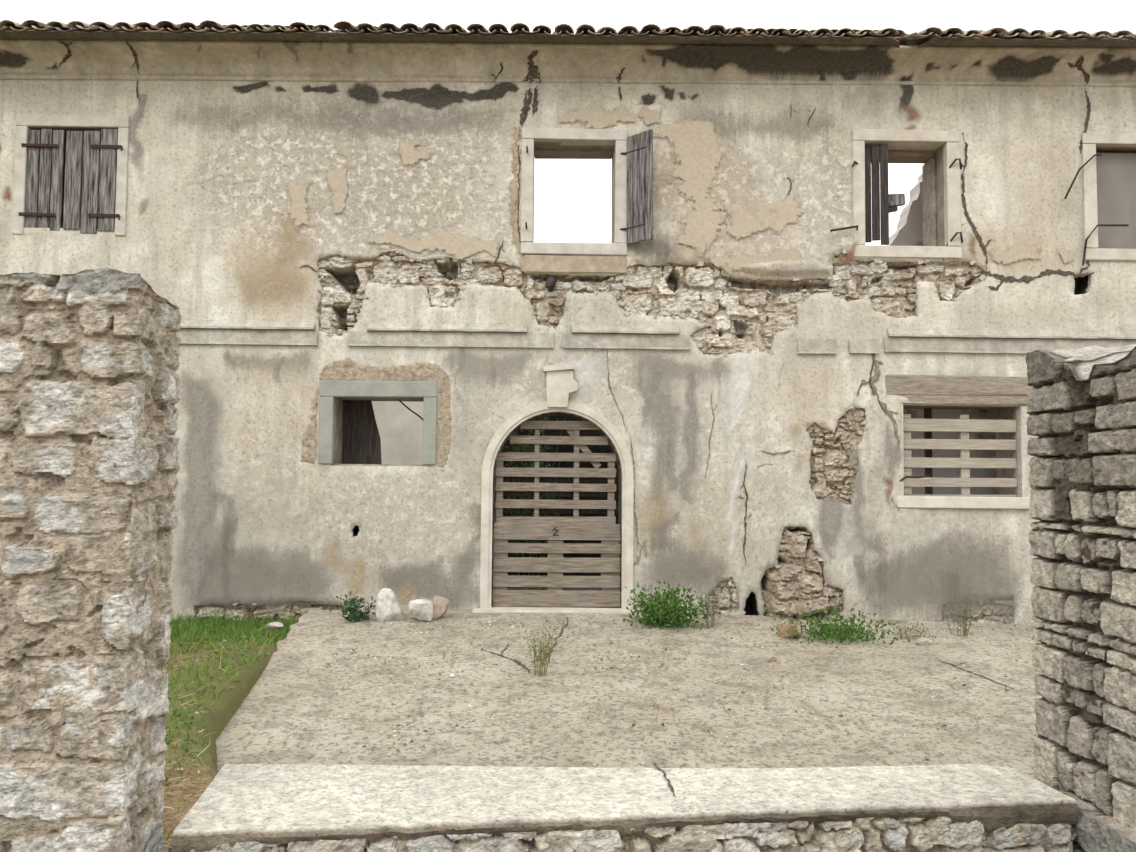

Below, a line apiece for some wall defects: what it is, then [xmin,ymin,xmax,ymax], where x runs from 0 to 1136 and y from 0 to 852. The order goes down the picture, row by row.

leakage [233,81,285,93]
leakage [260,82,519,129]
leakage [642,44,914,107]
leakage [972,56,1060,80]
leakage [1092,53,1136,75]
spalling [316,105,987,357]
crack [943,132,1094,291]
crack [606,349,642,557]
leakage [638,355,750,523]
spalling [806,405,869,505]
crack [857,354,900,449]
crack [739,450,791,562]